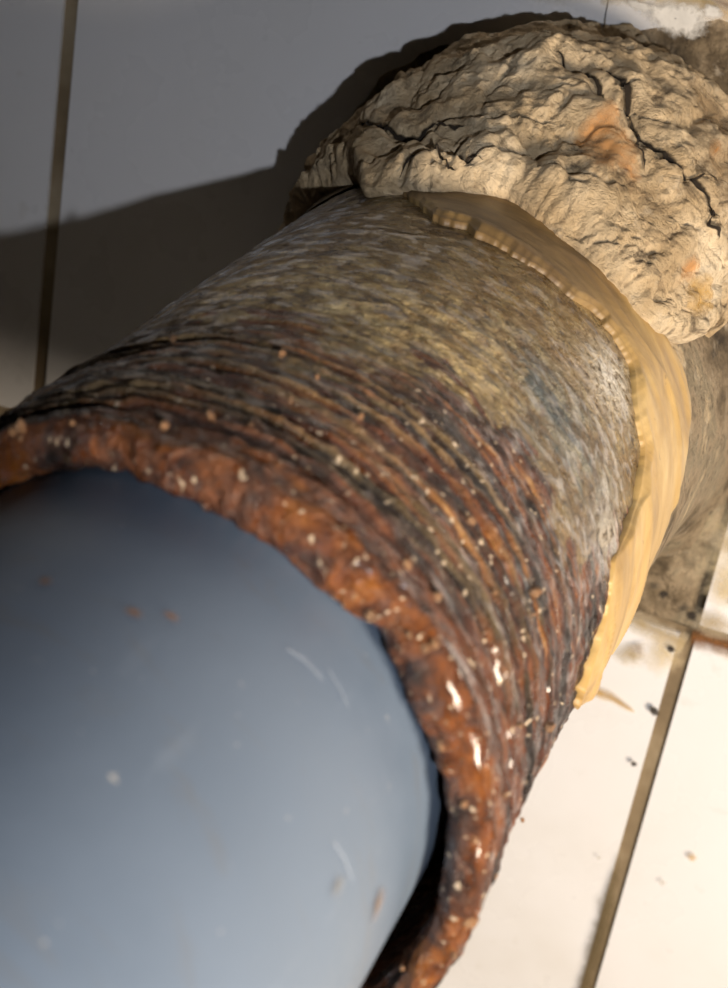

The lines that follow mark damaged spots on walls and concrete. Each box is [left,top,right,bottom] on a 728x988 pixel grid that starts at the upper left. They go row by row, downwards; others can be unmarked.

crack [360,118,483,177]
crack [555,51,722,238]
water stain [631,618,687,660]
corrosion [691,618,728,650]